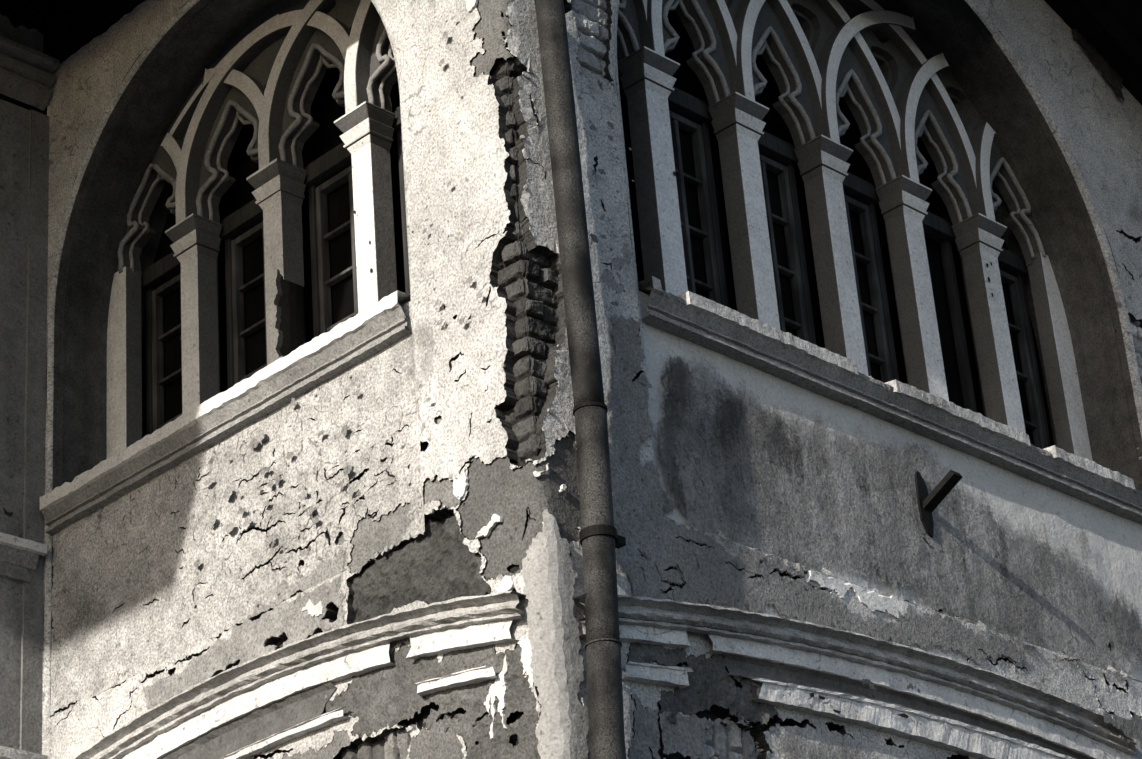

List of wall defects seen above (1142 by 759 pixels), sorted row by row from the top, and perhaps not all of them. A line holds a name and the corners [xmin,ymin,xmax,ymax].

spalling [571,0,618,91]
peeling [143,0,581,709]
spalling [1128,315,1142,386]
water stain [657,356,1142,680]
spalling [266,634,541,759]
spalling [627,643,859,759]
spalling [1099,705,1142,749]